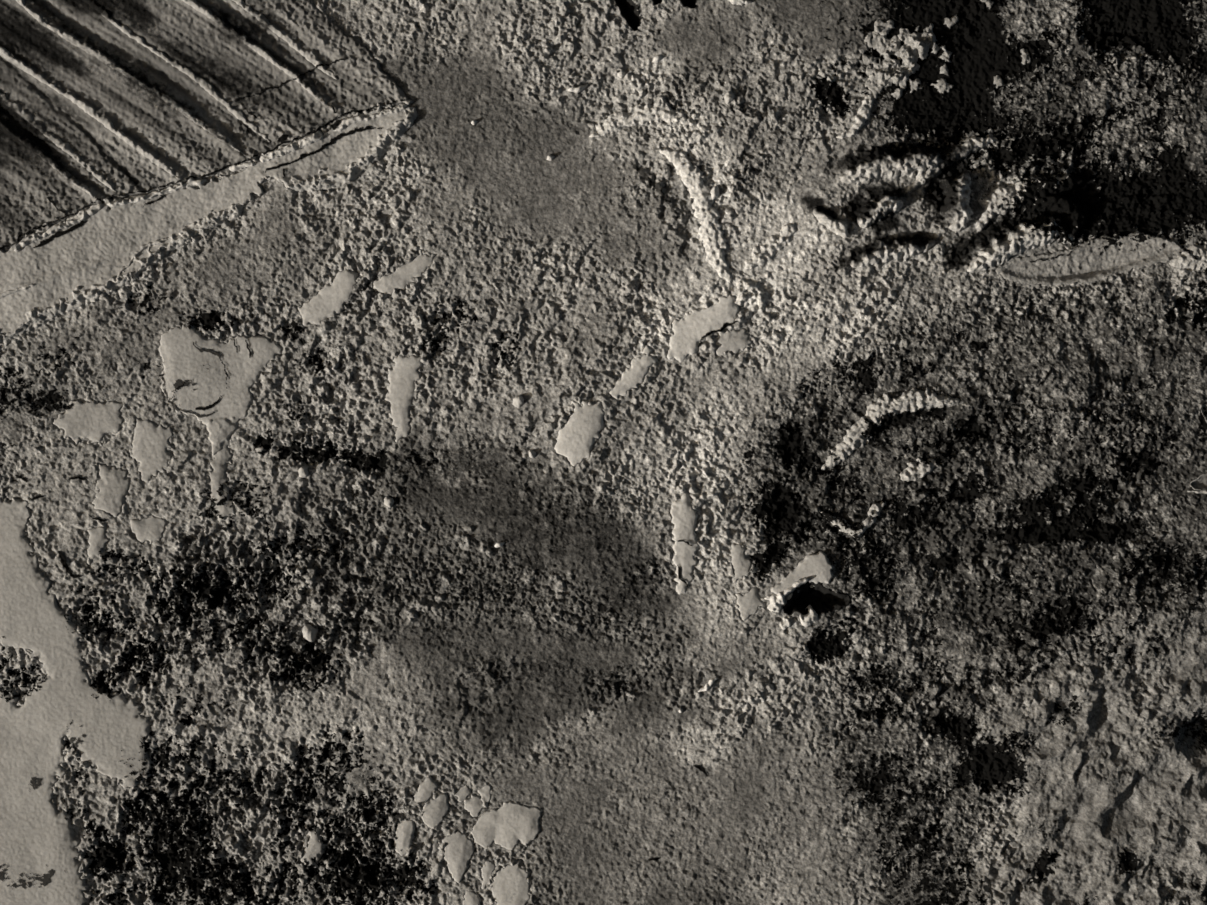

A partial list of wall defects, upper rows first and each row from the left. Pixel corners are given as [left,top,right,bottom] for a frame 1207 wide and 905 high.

peeling [0,0,417,250]
leakage [809,0,1207,260]
peeling [384,355,423,443]
peeling [554,293,752,466]
leakage [796,345,935,398]
leakage [953,328,994,355]
leakage [1165,279,1207,333]
peeling [670,494,699,595]
spalling [728,543,852,630]
leakage [741,355,1207,905]
peeling [0,494,153,905]
peeling [394,776,543,905]